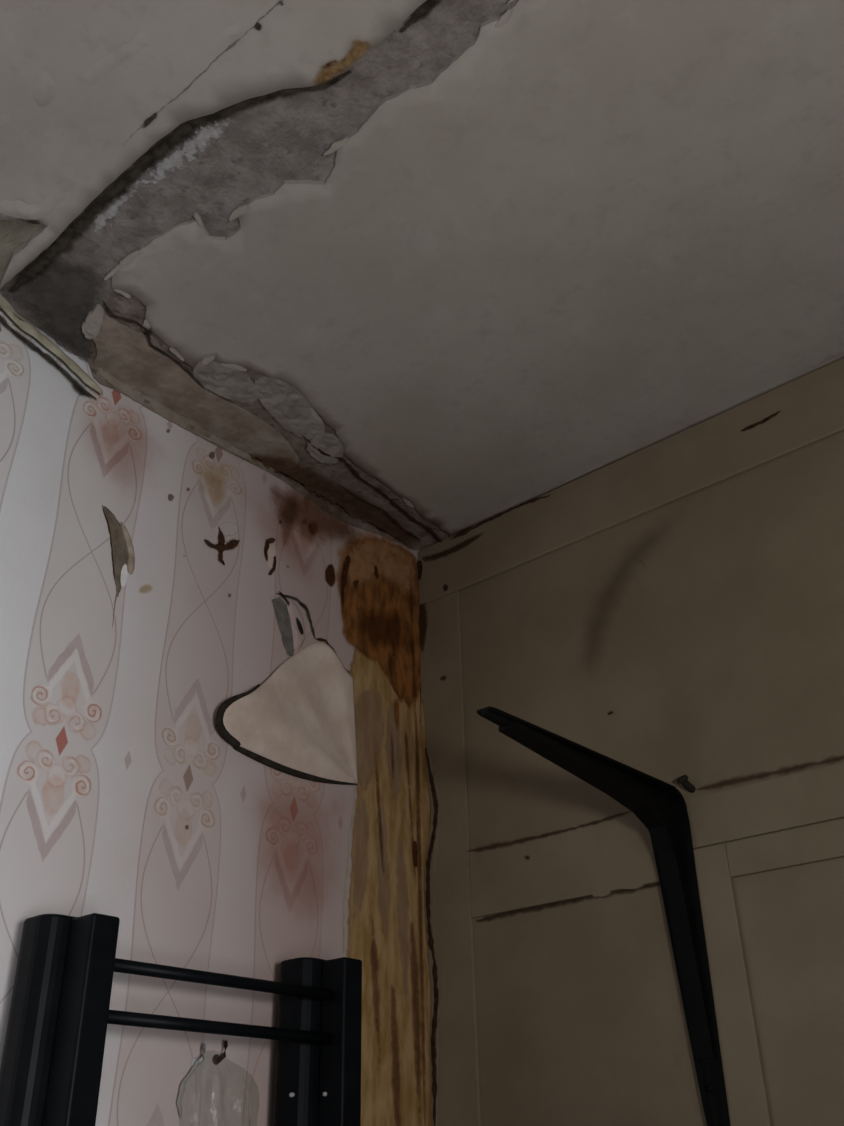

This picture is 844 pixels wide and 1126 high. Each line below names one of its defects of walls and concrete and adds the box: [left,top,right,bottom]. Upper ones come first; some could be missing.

spalling [0,0,516,579]
peeling [215,643,358,785]
crack [470,811,631,851]
crack [476,883,660,922]